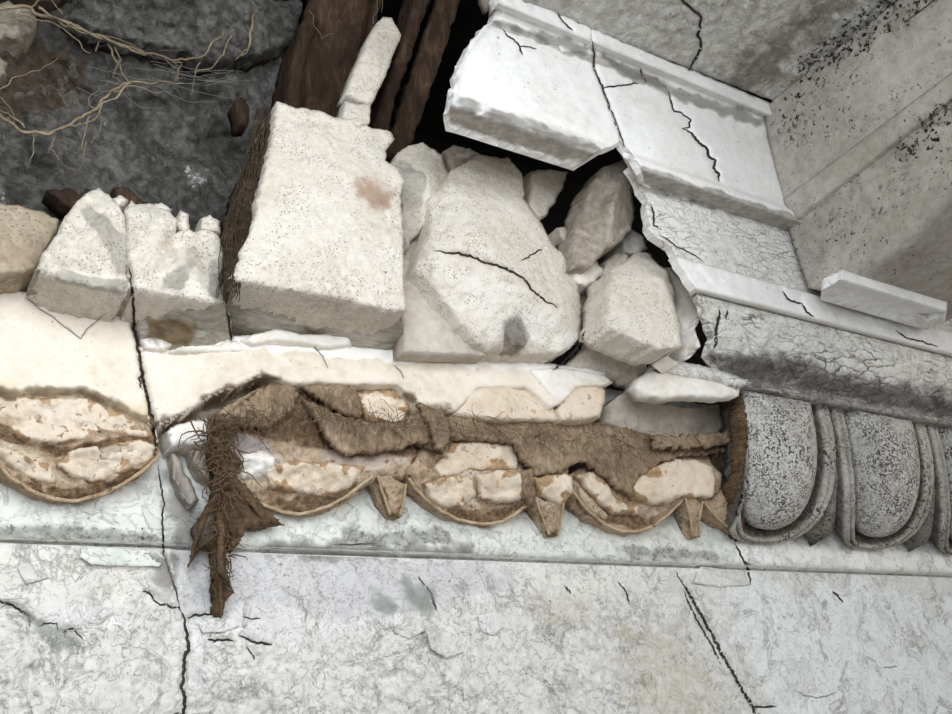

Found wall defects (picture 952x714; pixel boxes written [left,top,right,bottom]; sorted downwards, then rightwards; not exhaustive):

crack [503,29,537,55]
crack [557,13,645,147]
crack [681,0,702,70]
leakage [787,0,937,95]
crack [669,93,721,182]
leakage [894,97,952,166]
crack [434,249,556,307]
flaking render [529,368,613,407]
crack [129,269,272,714]
crack [677,573,776,714]